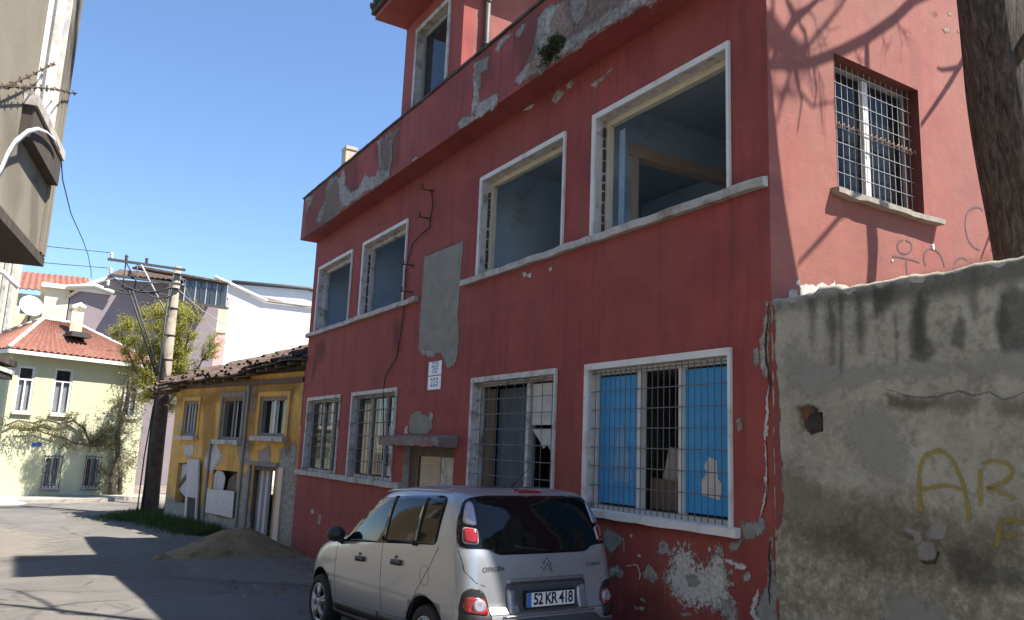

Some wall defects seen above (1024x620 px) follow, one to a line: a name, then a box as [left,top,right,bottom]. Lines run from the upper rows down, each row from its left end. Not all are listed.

flaking render [458,0,660,128]
peeling [306,125,400,224]
peeling [163,498,184,519]
peeling [183,443,223,474]
peeling [204,437,299,546]
peeling [404,411,433,434]
crack [753,301,771,517]
spalling [804,407,820,435]
peeling [602,517,777,620]